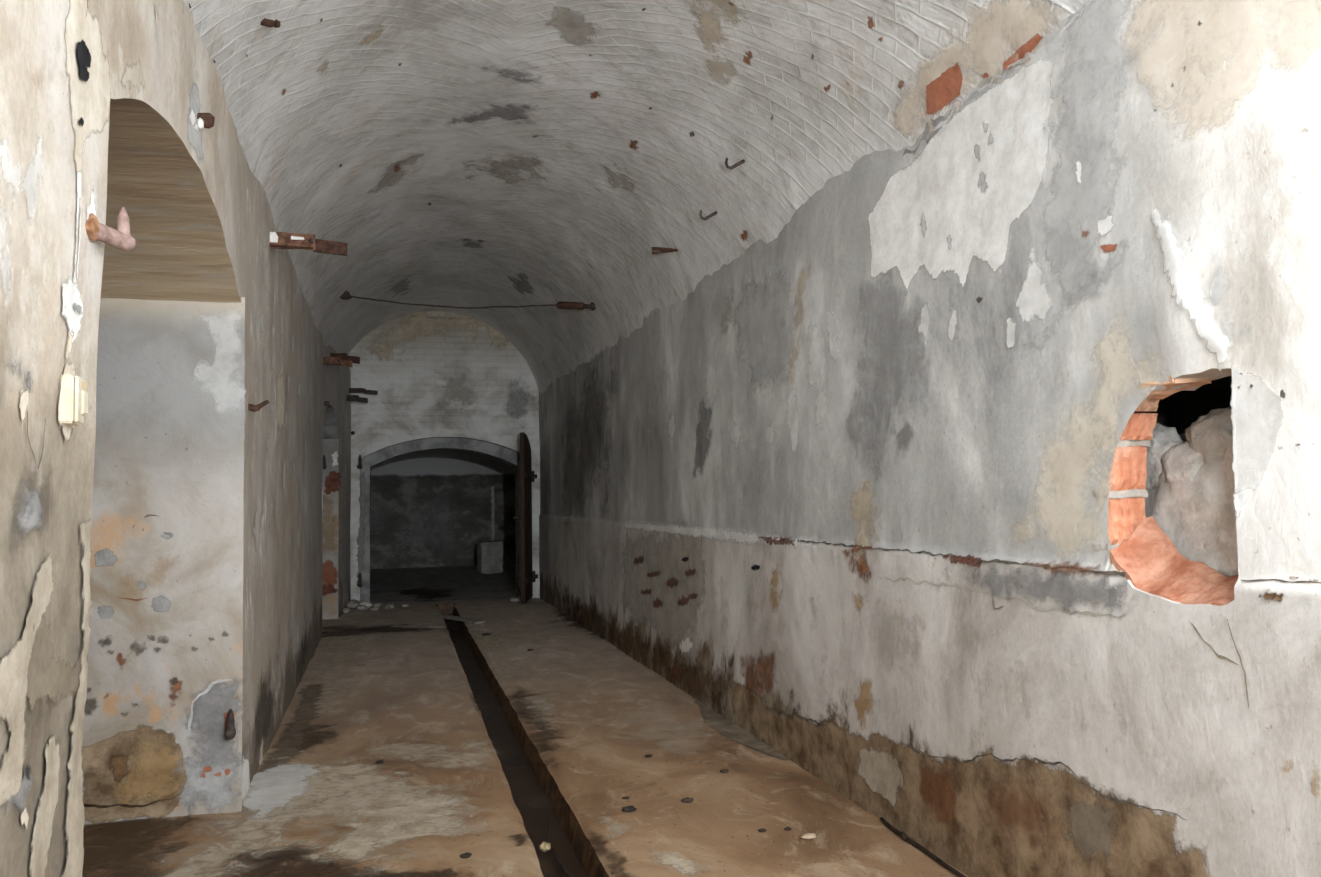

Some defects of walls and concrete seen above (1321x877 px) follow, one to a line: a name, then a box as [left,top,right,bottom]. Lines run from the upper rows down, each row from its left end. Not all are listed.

peeling [868,0,1054,290]
flaking render [1097,215,1117,252]
peeling [918,304,931,344]
peeling [948,310,957,340]
peeling [807,310,840,425]
spalling [1147,373,1253,435]
peeling [1233,489,1249,517]
crack [624,521,1126,618]
crack [1241,576,1321,584]
leakage [82,624,492,877]